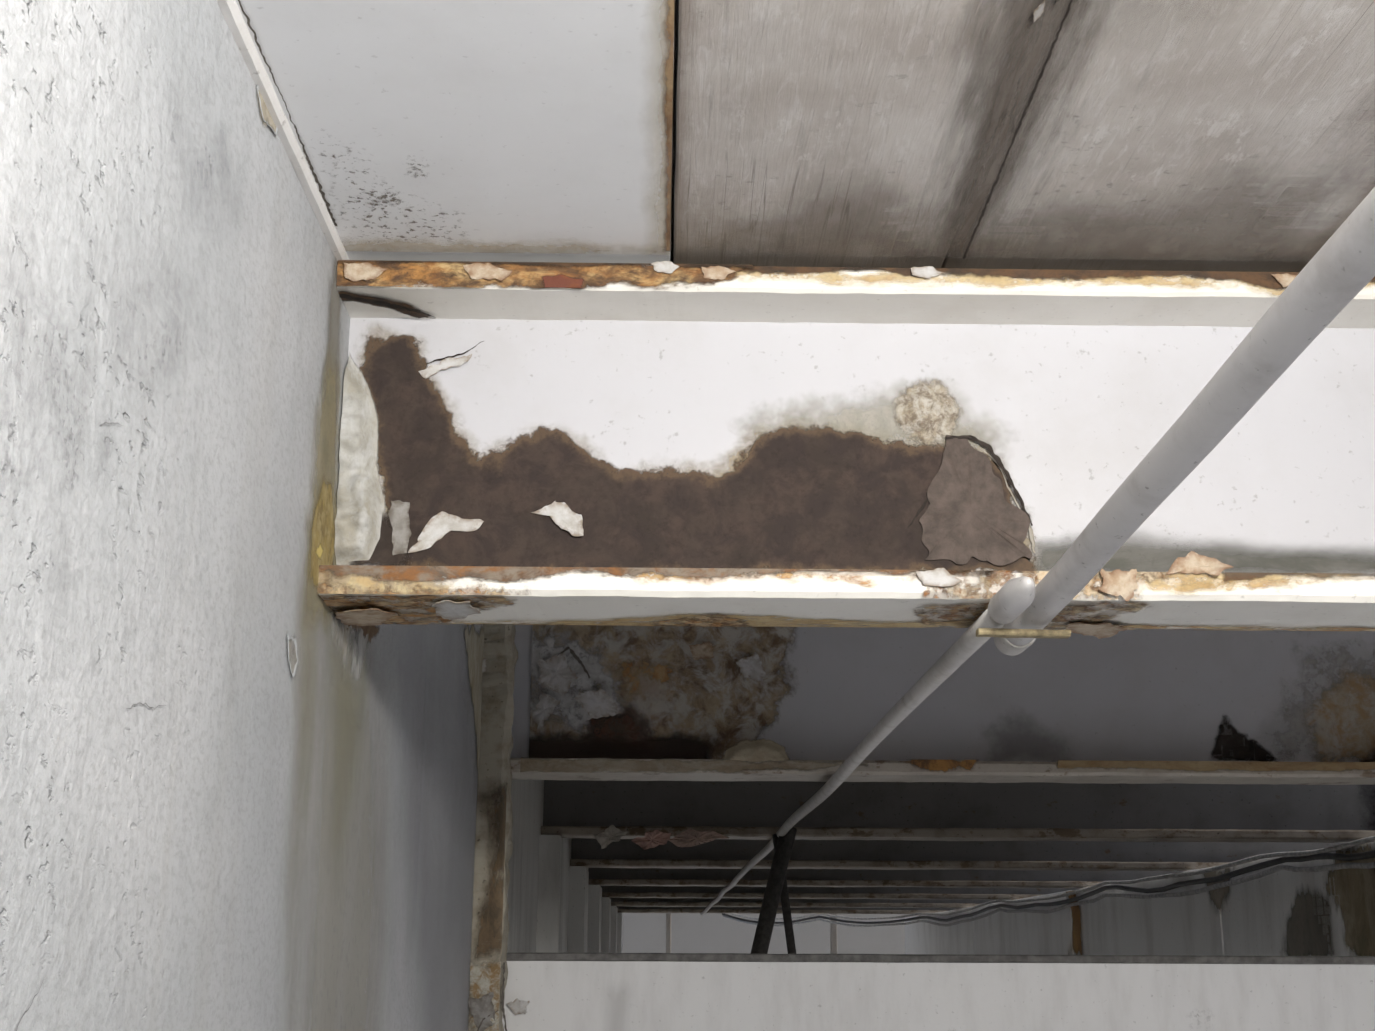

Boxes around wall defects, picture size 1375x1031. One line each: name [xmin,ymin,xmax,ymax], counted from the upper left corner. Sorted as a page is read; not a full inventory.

mould [238,0,456,244]
rust [336,0,1300,319]
water stain [952,0,1092,259]
peeling [359,335,1038,573]
peeling [1166,551,1233,576]
spalling [529,623,796,760]
spalling [1274,647,1375,762]
flaking render [468,784,530,1031]